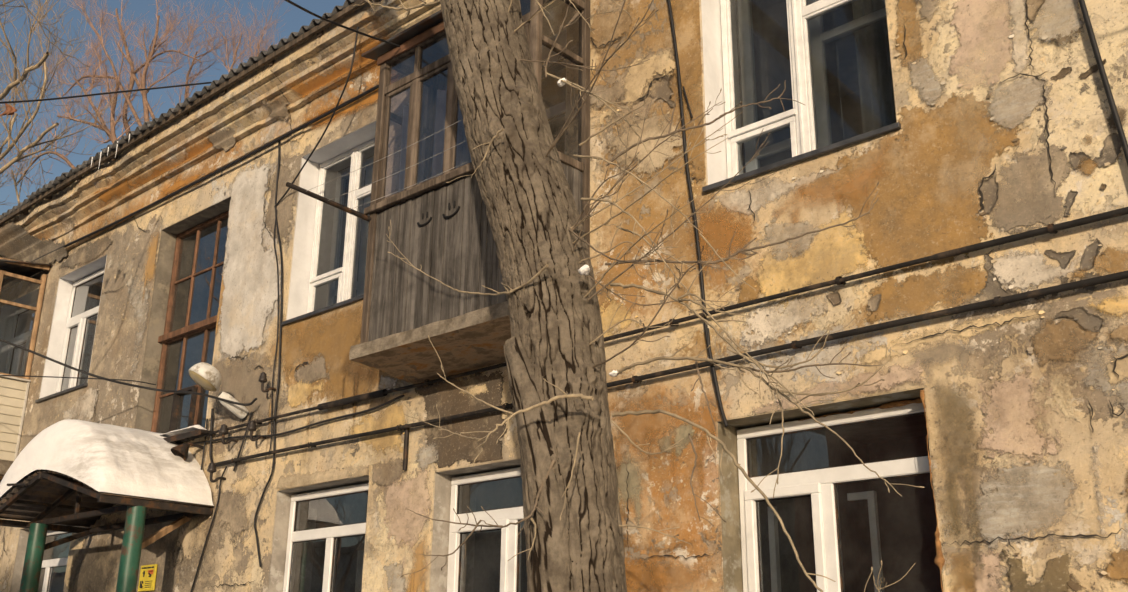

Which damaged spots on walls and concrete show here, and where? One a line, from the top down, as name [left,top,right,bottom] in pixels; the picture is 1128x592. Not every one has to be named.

peeling [590,0,705,183]
crack [999,0,1056,197]
spalling [0,222,113,270]
peeling [287,352,330,408]
peeling [715,0,1128,592]
crack [942,528,1125,551]